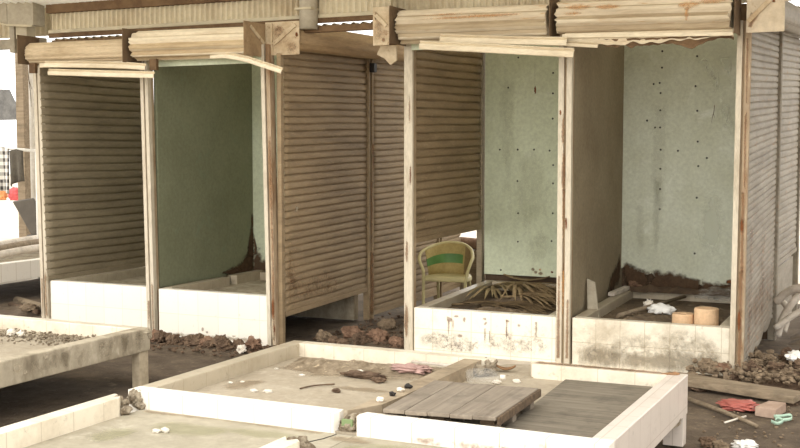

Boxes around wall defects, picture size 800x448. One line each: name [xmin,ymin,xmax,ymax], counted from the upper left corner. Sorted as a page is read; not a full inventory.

rust [569,5,617,14]
rust [679,0,721,20]